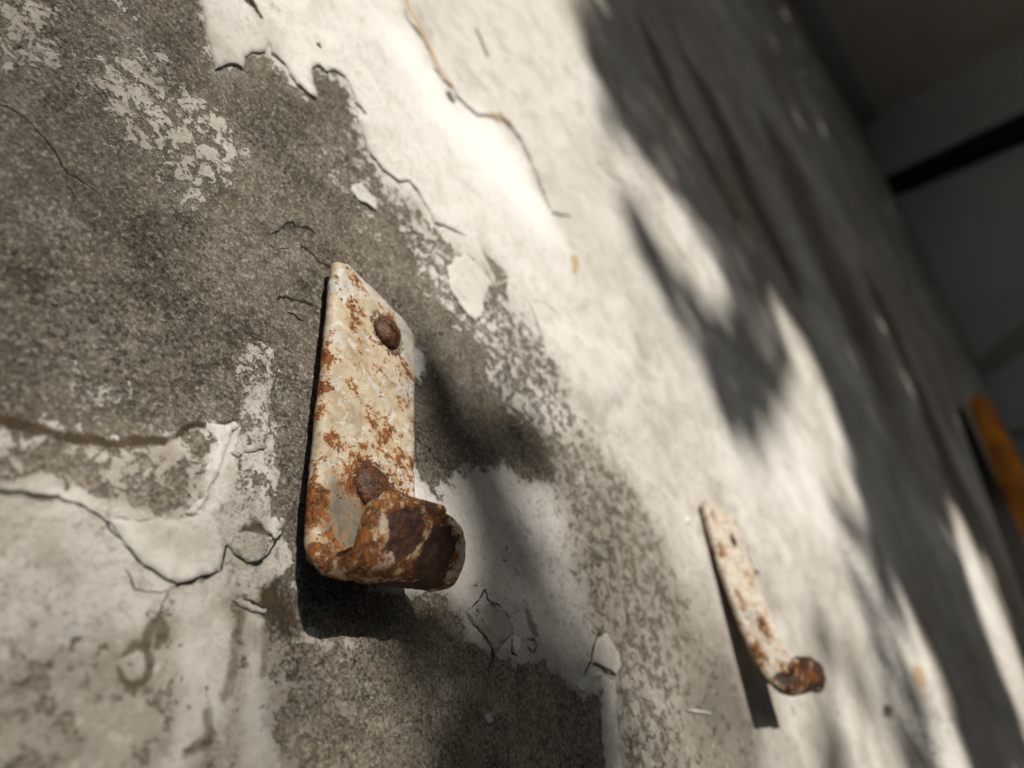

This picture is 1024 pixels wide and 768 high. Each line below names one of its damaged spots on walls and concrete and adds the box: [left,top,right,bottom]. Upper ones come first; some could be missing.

peeling [201,0,466,236]
peeling [401,0,572,217]
crack [499,118,550,209]
spalling [277,295,312,321]
peeling [447,248,510,322]
spalling [107,349,285,584]
crack [0,489,229,619]
spalling [233,598,267,614]
peeling [465,589,539,663]
peeling [576,631,622,768]